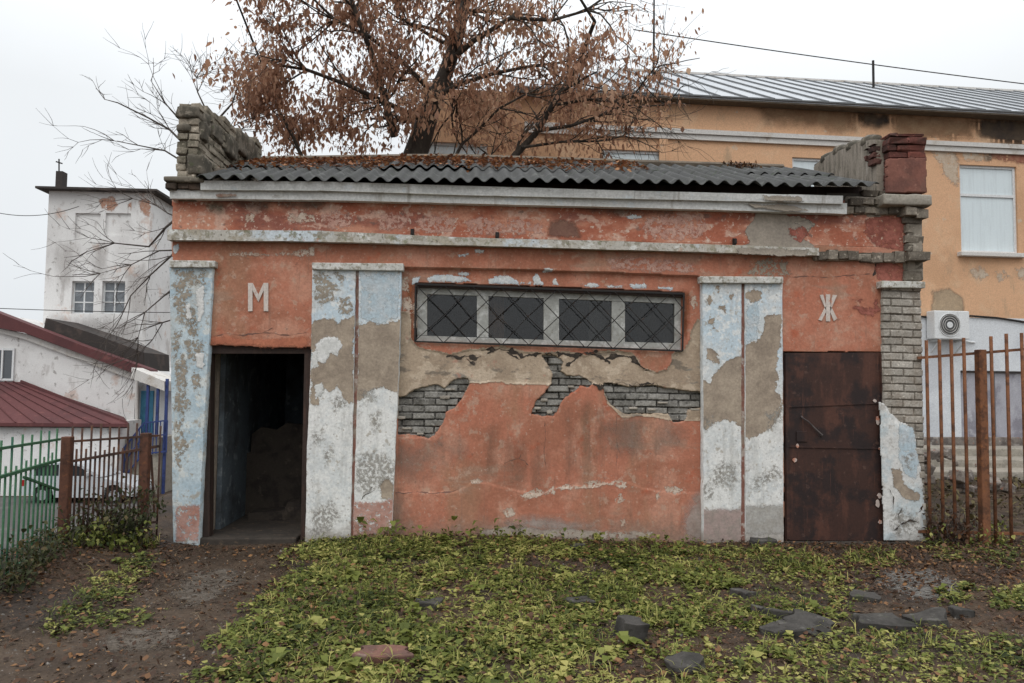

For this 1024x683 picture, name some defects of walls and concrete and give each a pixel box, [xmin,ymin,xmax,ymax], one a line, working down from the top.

peeling [288,211,352,229]
peeling [379,212,543,235]
peeling [626,212,706,241]
flaking render [789,226,809,243]
flaking render [863,216,906,251]
flaking render [171,268,783,467]
peeling [353,453,394,537]
crack [361,487,455,500]
peeling [704,462,737,498]
flaking render [873,399,926,540]
peeling [176,505,200,542]
peeling [312,501,339,536]